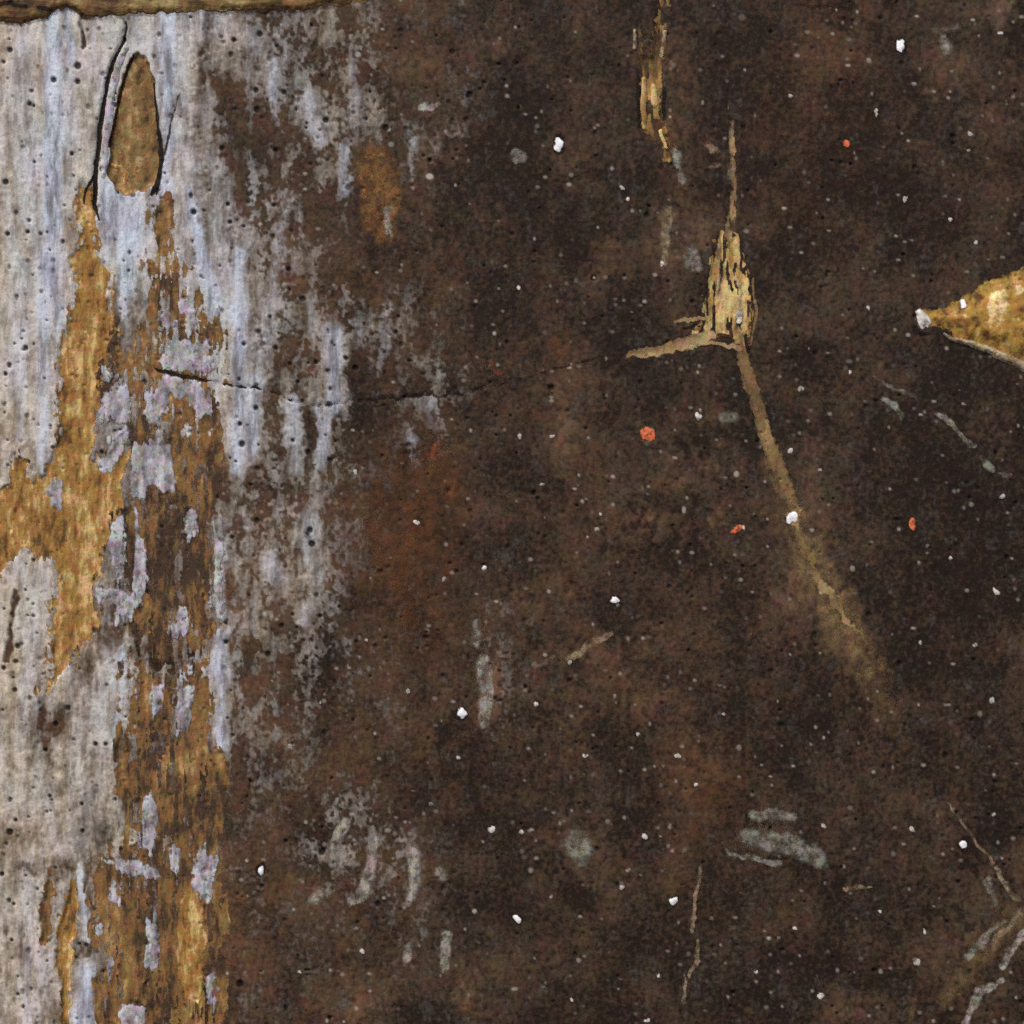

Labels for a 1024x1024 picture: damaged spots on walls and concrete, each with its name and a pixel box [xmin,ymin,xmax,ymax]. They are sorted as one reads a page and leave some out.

crack [83,22,128,221]
crack [163,93,180,157]
spalling [633,0,685,184]
corrosion [357,144,400,242]
spalling [913,267,1024,371]
crack [155,368,335,407]
crack [360,392,472,402]
crack [499,105,884,678]
peeling [0,46,233,1024]